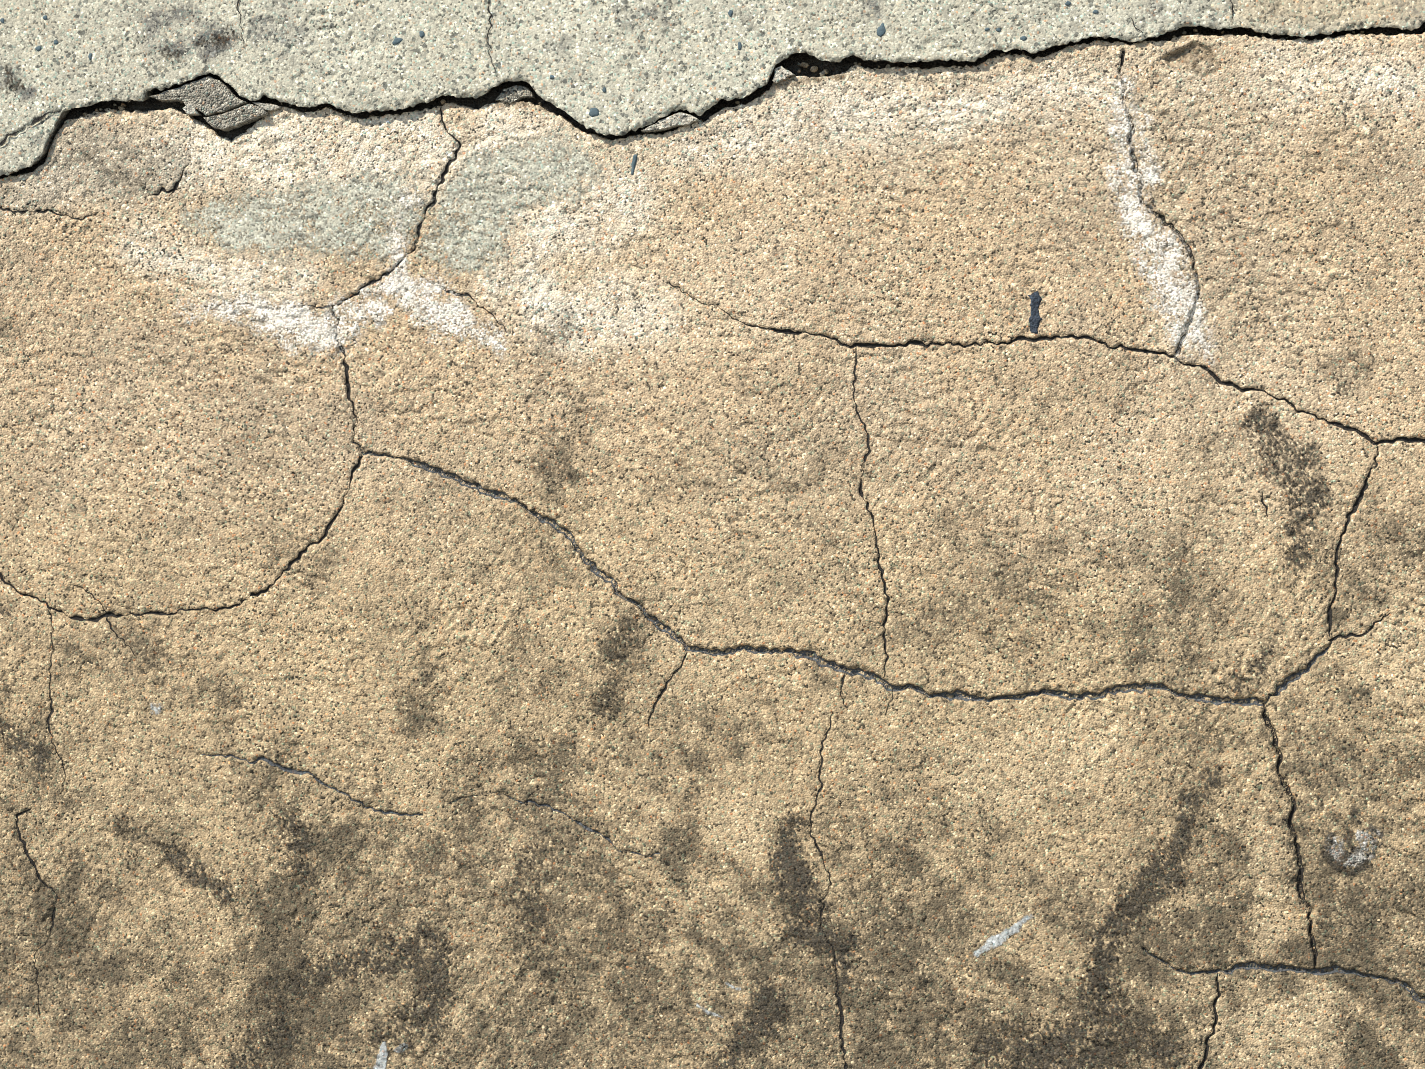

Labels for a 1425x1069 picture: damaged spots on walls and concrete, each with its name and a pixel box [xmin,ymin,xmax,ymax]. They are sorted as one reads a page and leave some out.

crack [0,154,48,179]
crack [0,111,59,145]
spalling [0,108,74,176]
peeling [93,75,329,132]
crack [58,18,1425,326]
crack [0,207,98,220]
water stain [1106,72,1216,362]
water stain [177,187,507,356]
crack [0,275,1425,1069]